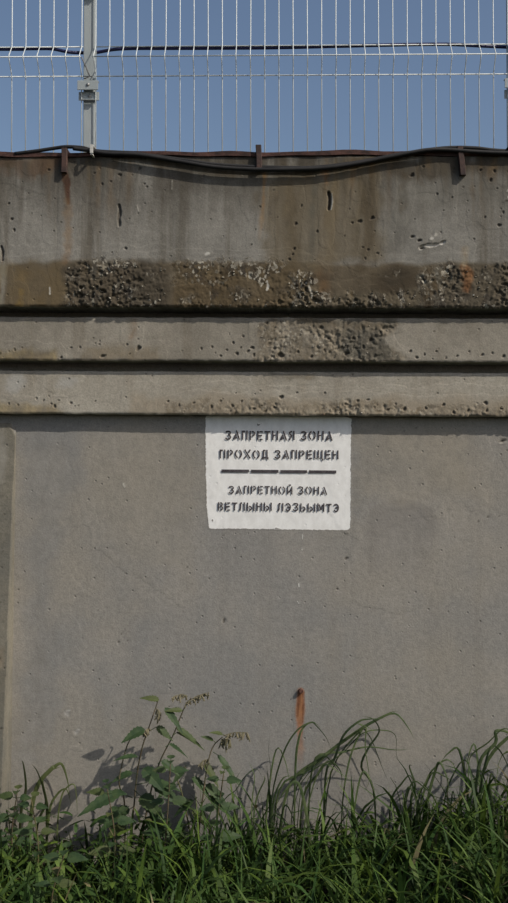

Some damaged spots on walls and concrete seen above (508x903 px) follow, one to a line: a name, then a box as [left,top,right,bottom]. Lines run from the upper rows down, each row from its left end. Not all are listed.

spalling [0,201,17,263]
spalling [115,202,132,229]
leakage [0,155,508,308]
spalling [325,189,335,212]
spalling [46,226,508,362]
rust [291,684,309,773]